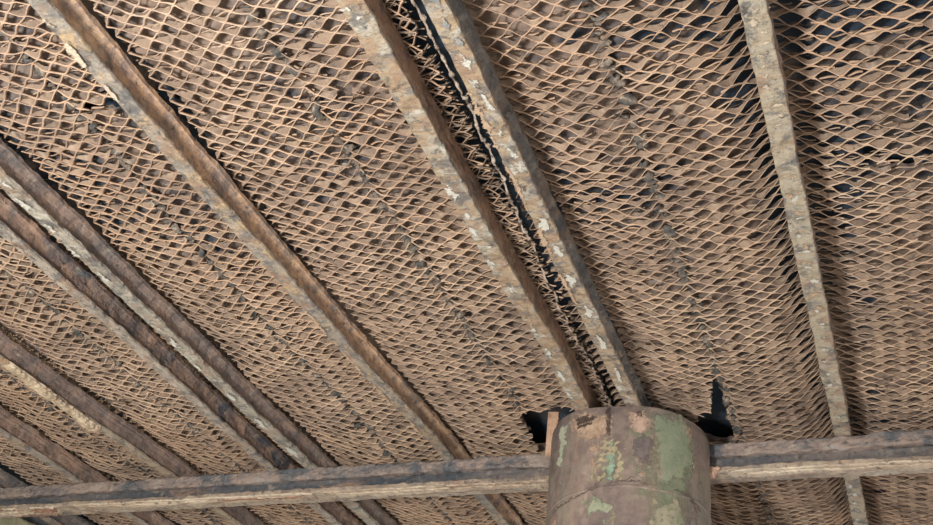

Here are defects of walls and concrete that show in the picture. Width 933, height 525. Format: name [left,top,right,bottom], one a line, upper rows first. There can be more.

rust [571,411,609,472]
peeling [590,437,636,482]
rust [627,410,653,477]
peeling [631,411,702,525]
peeling [582,496,616,525]